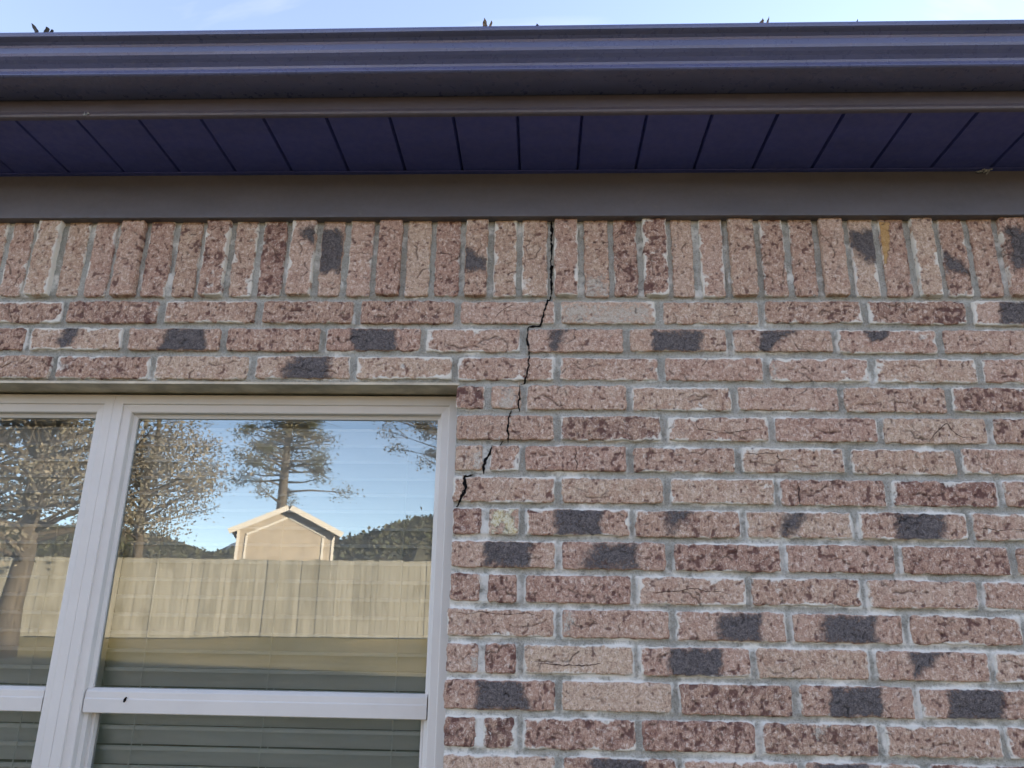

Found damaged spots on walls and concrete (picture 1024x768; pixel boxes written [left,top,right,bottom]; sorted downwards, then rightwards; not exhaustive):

crack [456,222,554,507]